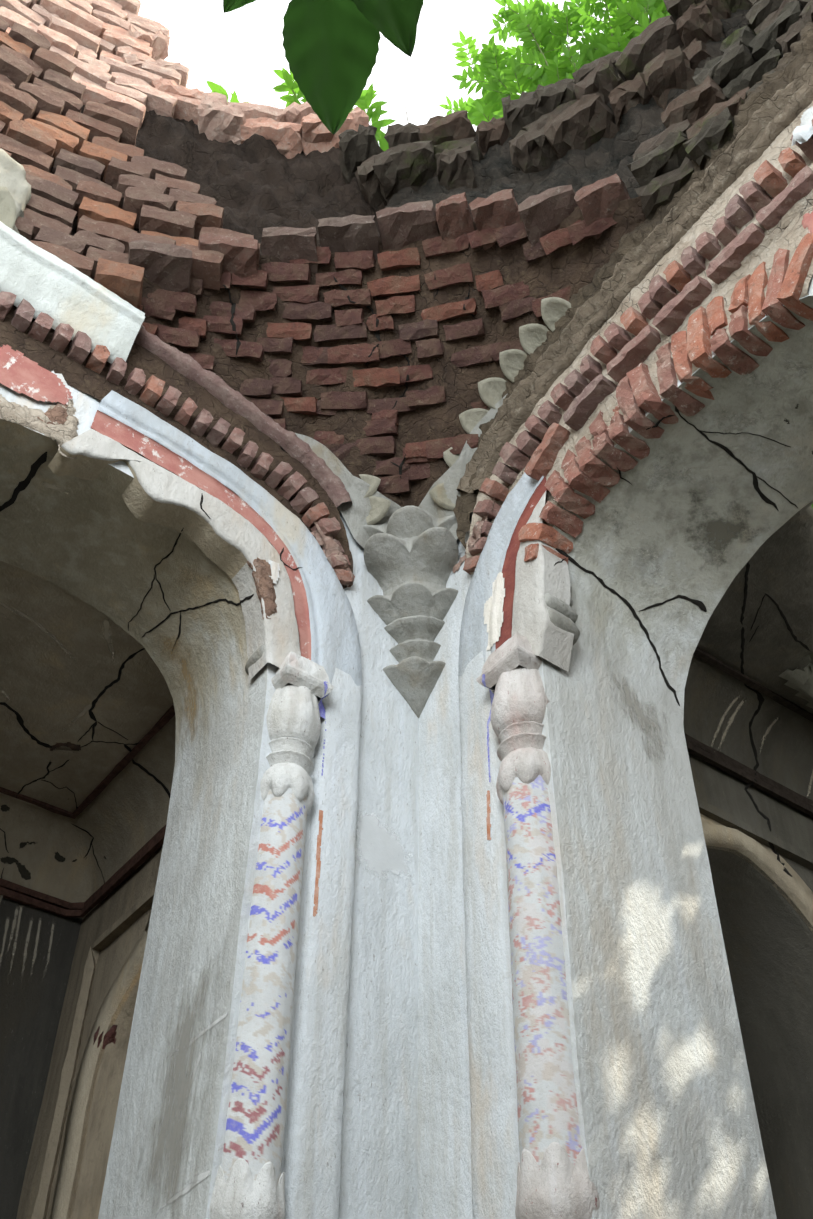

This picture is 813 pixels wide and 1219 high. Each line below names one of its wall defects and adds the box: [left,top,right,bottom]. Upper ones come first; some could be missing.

crack [0,452,47,512]
peeling [0,344,79,459]
crack [646,406,798,511]
flaking render [246,557,280,619]
crack [555,548,707,706]
crack [0,494,254,889]
crack [740,562,810,877]